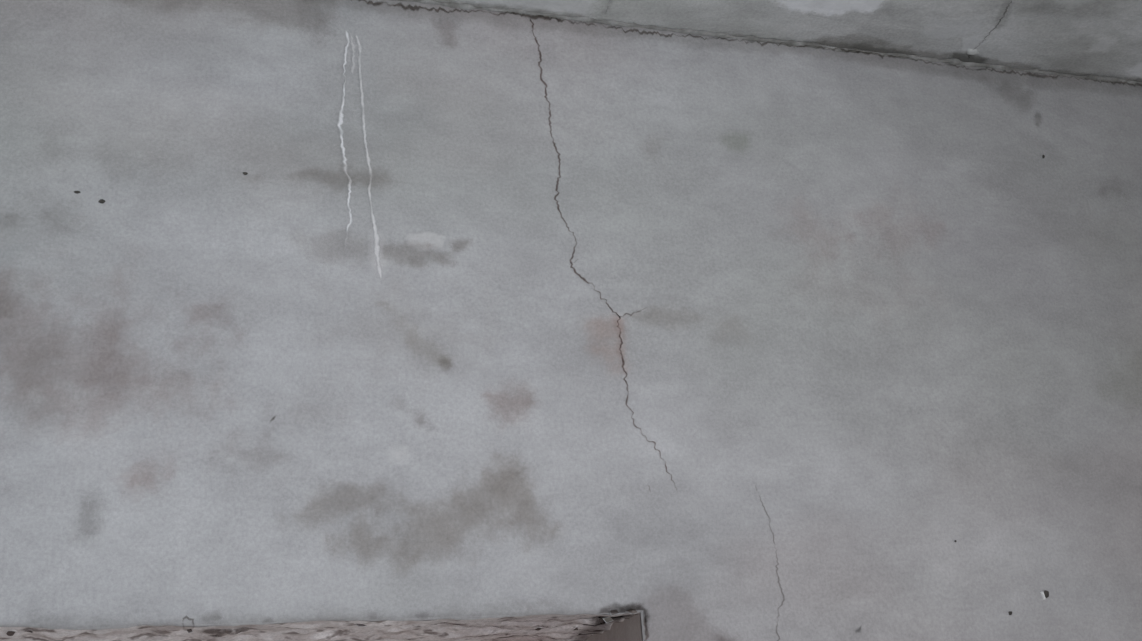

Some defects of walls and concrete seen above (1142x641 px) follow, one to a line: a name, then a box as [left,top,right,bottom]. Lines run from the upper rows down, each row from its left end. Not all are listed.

crack [376,3,476,13]
crack [959,33,989,55]
crack [513,12,668,473]